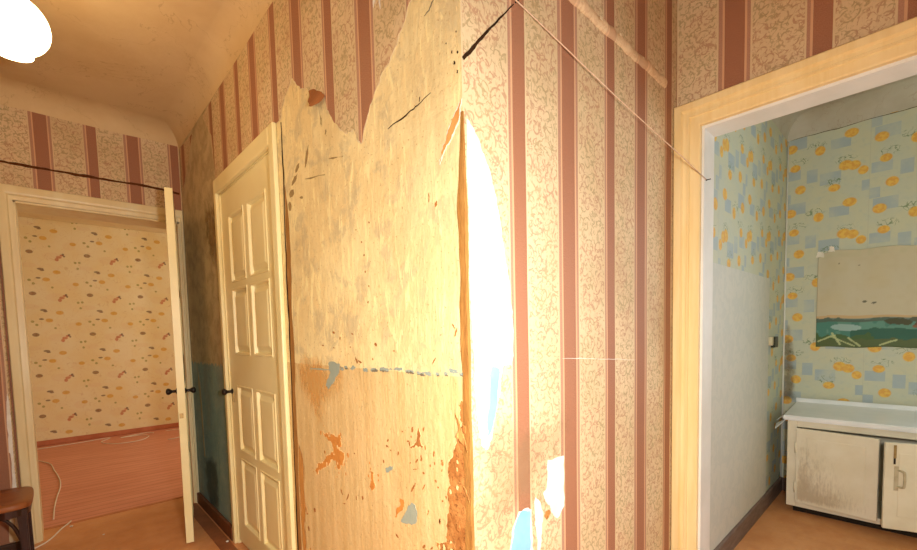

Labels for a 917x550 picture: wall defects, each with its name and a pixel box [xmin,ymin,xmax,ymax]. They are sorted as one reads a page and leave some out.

crack [462,4,514,60]
crack [388,93,430,129]
flaking render [288,147,325,211]
water stain [205,211,216,264]
peeling [311,347,463,389]
peeling [313,425,355,478]
peeling [341,460,393,504]
flaking render [402,400,470,550]
peeling [395,499,429,525]